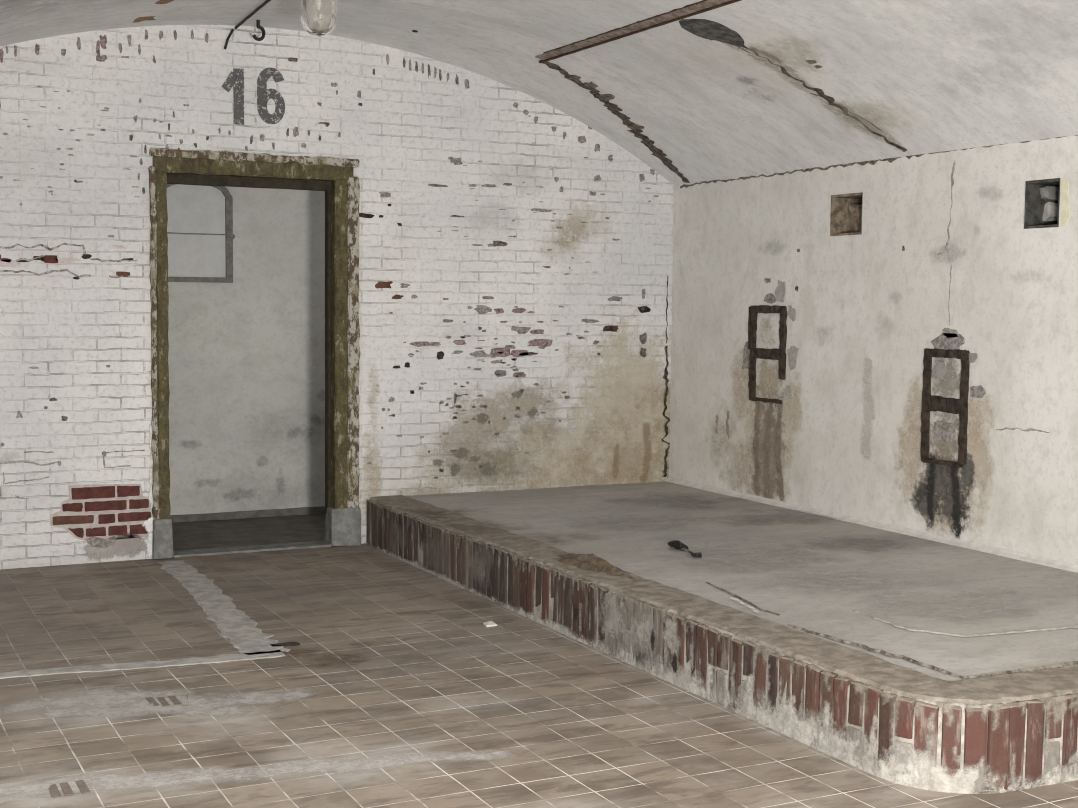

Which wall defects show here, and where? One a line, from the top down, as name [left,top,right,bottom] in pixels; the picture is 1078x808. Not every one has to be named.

peeling [0,104,392,547]
peeling [375,281,418,299]
peeling [393,296,559,435]
water stain [405,322,671,496]